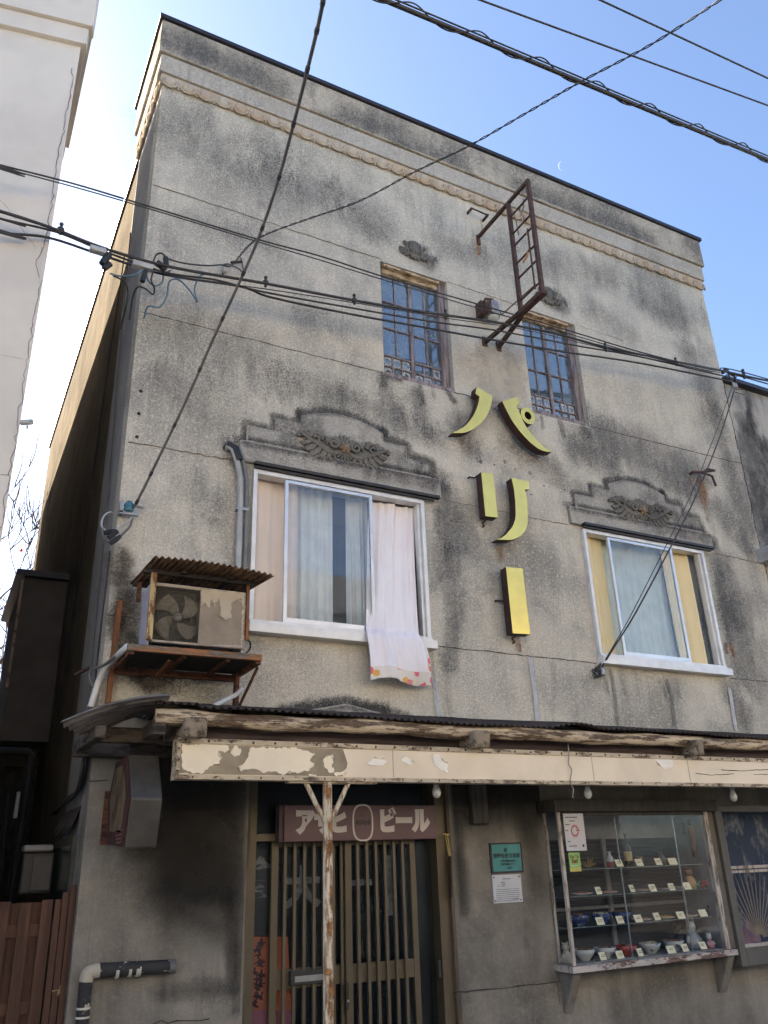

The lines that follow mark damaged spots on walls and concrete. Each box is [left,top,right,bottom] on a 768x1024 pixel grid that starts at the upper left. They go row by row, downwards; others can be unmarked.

damp [566,425,754,672]
damp [108,548,139,648]
damp [123,666,174,694]
damp [278,697,407,716]
peeling [179,742,347,776]
peeling [654,759,674,770]
damp [135,759,245,919]